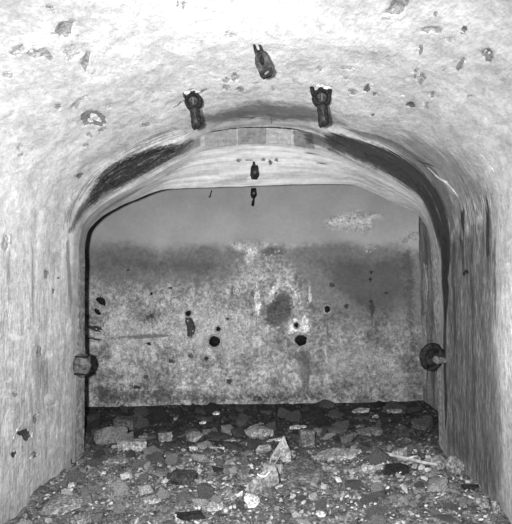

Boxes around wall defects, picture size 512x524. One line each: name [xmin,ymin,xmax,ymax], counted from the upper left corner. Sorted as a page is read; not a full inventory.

spalling [382,0,409,21]
spalling [50,19,79,37]
spalling [480,48,493,63]
spalling [81,111,107,137]
damp [103,131,200,188]
damp [232,243,284,268]
damp [304,129,453,435]
damp [254,275,309,334]
spalling [13,425,34,441]